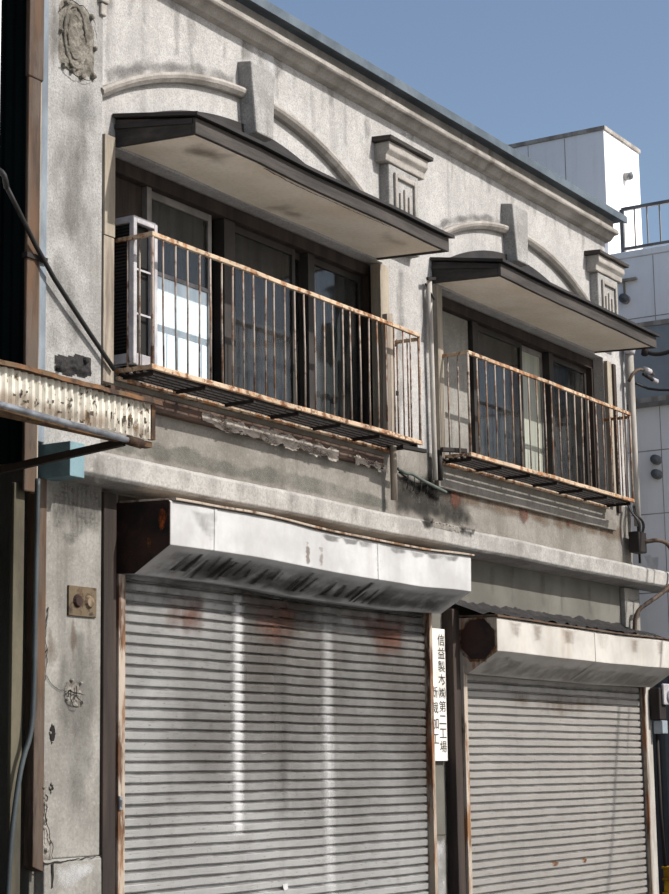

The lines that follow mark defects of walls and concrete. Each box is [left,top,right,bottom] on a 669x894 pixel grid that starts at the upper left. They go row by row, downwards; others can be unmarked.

peeling [202,412,339,462]
damp [397,477,469,522]